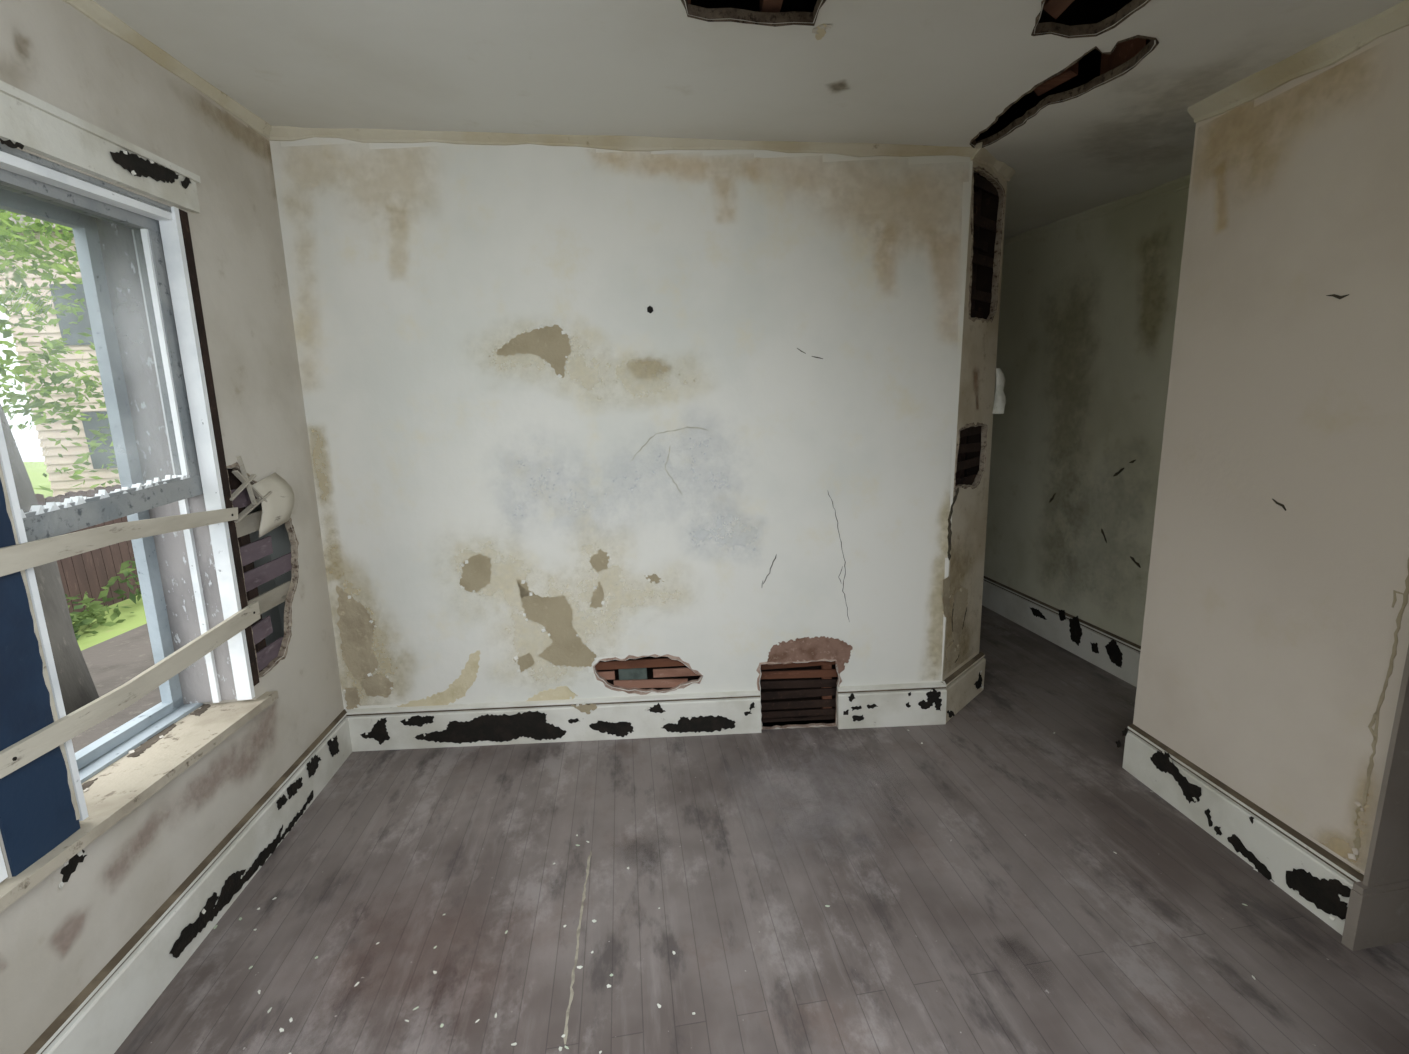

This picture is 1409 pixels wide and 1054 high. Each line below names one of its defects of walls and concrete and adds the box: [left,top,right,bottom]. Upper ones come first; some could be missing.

spalling [968,166,1006,323]
peeling [495,324,571,378]
peeling [127,723,177,757]
spalling [226,456,299,678]
peeling [459,554,492,592]
peeling [336,586,634,745]
spalling [514,579,878,734]
peeling [1030,608,1123,667]
crack [1362,558,1409,807]
peeling [59,849,87,890]
peeling [169,735,339,958]
peeling [1150,750,1351,921]